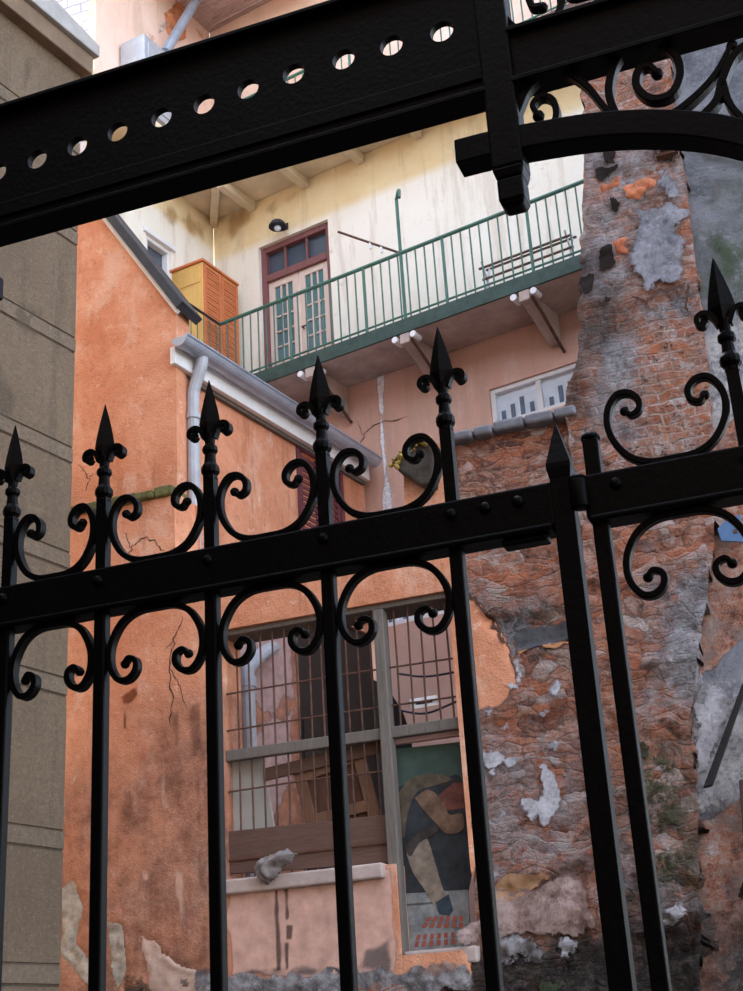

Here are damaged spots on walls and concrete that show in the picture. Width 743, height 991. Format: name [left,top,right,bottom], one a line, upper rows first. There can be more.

flaking render [579,151,692,294]
crack [166,617,186,730]
flaking render [483,748,527,775]
flaking render [521,733,561,826]
flaking render [693,686,728,780]
flaking render [61,881,88,984]
flaking render [108,922,127,988]
flaking render [141,936,210,991]
flaking render [227,884,340,991]
flaking render [353,869,473,991]
flaking render [456,918,481,946]
flaking render [495,872,597,938]